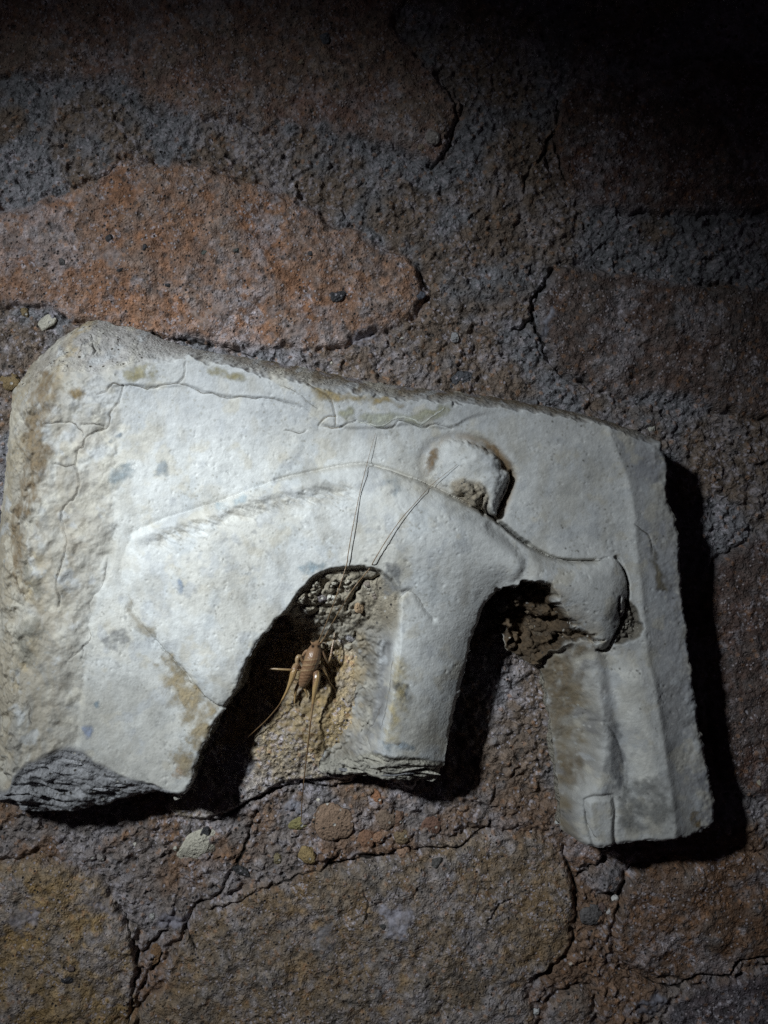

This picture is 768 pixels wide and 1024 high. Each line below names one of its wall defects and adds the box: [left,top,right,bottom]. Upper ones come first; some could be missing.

crack [436,83,459,165]
crack [524,99,567,193]
crack [513,272,551,361]
crack [186,780,478,949]
crack [562,847,601,939]
crack [121,906,162,1024]
crack [619,956,768,988]